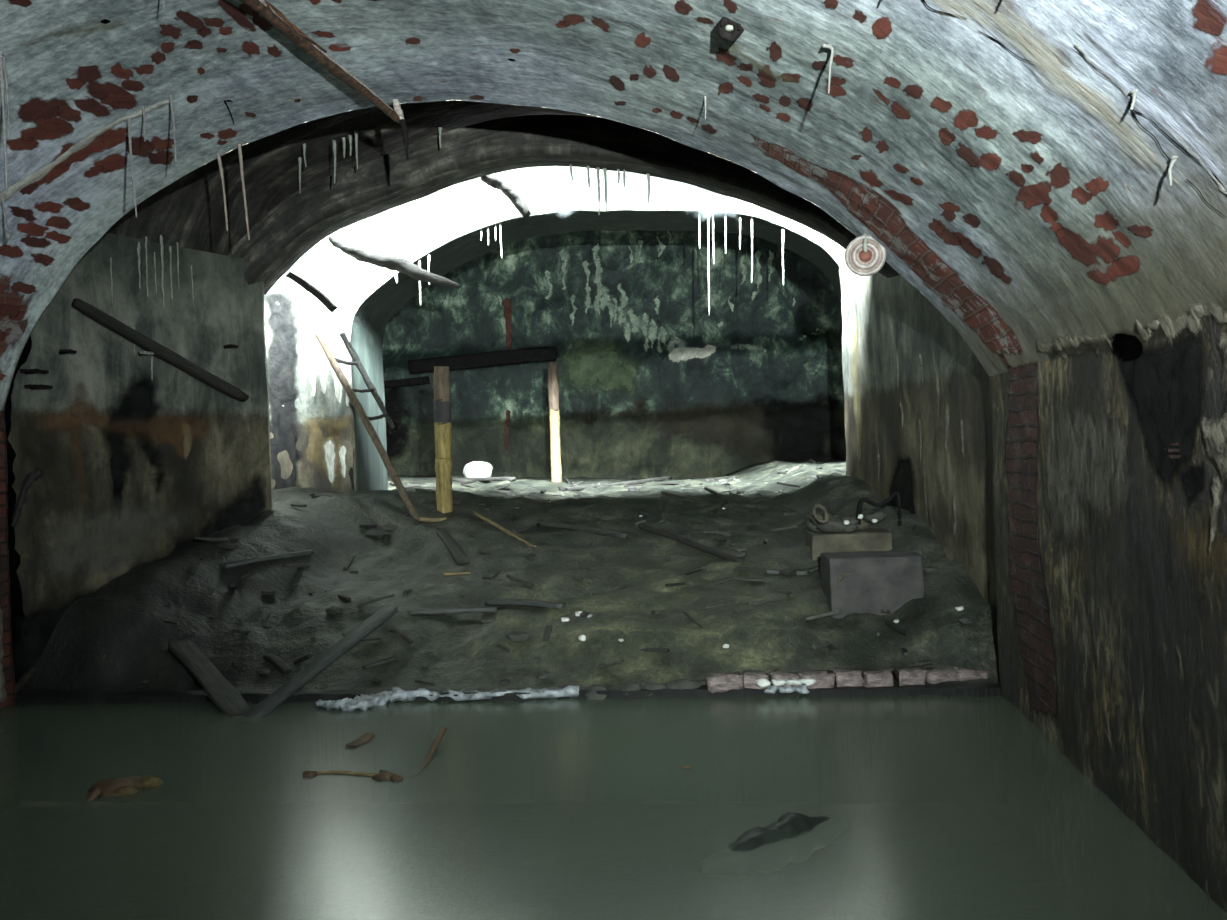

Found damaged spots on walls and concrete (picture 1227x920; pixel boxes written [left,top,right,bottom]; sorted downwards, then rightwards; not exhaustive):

peeling [0,0,282,266]
damp [545,243,716,362]
peeling [716,41,813,122]
peeling [853,10,892,39]
peeling [752,127,1023,366]
peeling [873,77,1153,285]
crack [922,0,1227,217]
peeling [1192,0,1227,75]
damp [173,292,351,553]
damp [384,388,410,460]
damp [566,396,845,462]
damp [1202,412,1227,553]